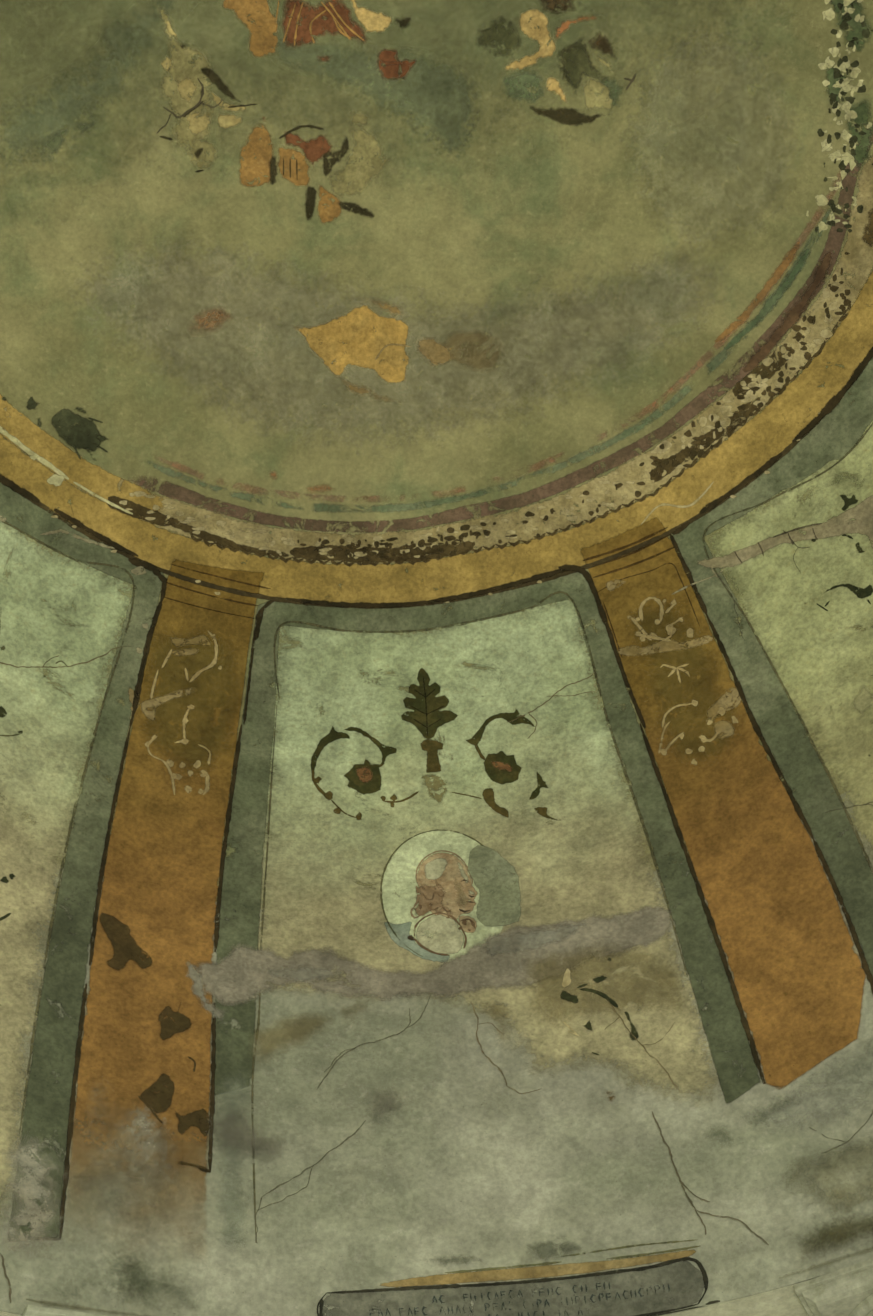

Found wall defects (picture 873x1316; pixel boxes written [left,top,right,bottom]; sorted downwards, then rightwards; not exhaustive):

peeling [299,301,451,400]
peeling [0,426,133,515]
crack [255,1120,366,1242]
crack [652,1112,769,1245]
damp [804,1217,873,1251]